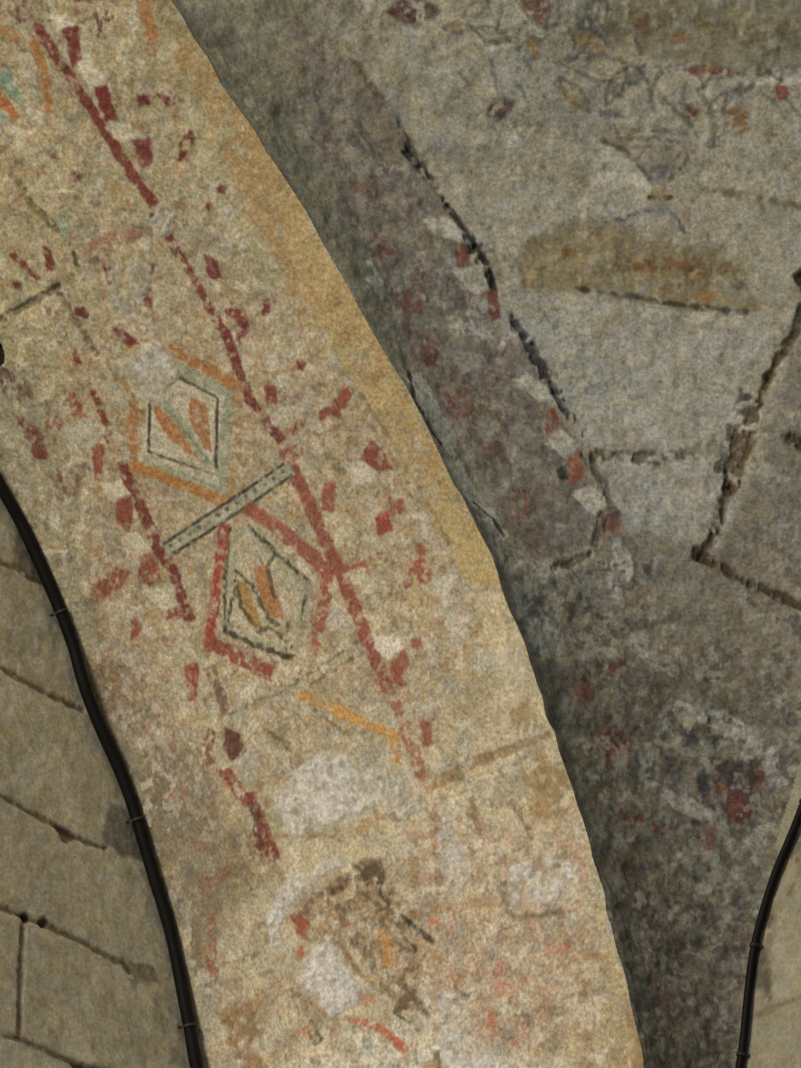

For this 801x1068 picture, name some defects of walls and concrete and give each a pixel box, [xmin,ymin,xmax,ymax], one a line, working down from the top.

crack [398,121,497,291]
crack [511,315,576,421]
crack [693,271,801,610]